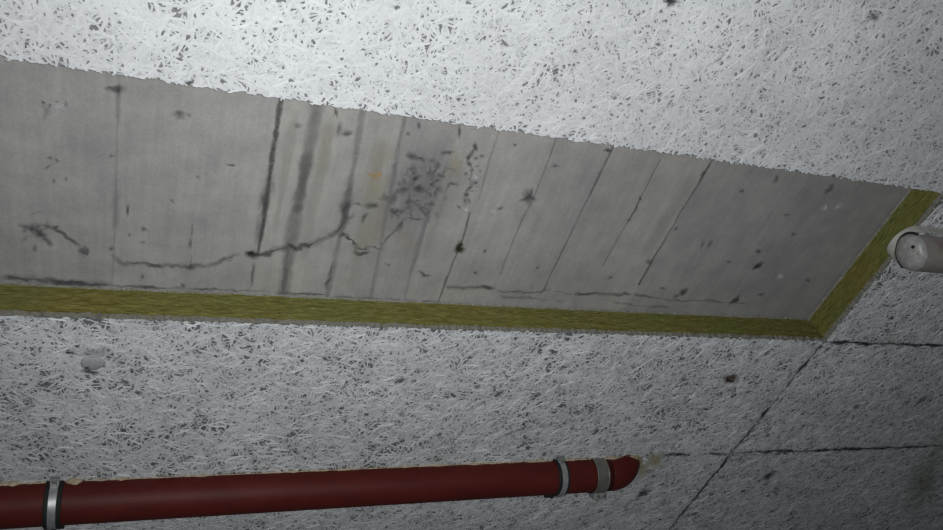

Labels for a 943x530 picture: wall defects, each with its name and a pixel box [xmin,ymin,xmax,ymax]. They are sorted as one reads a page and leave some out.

leakage [258,101,282,250]